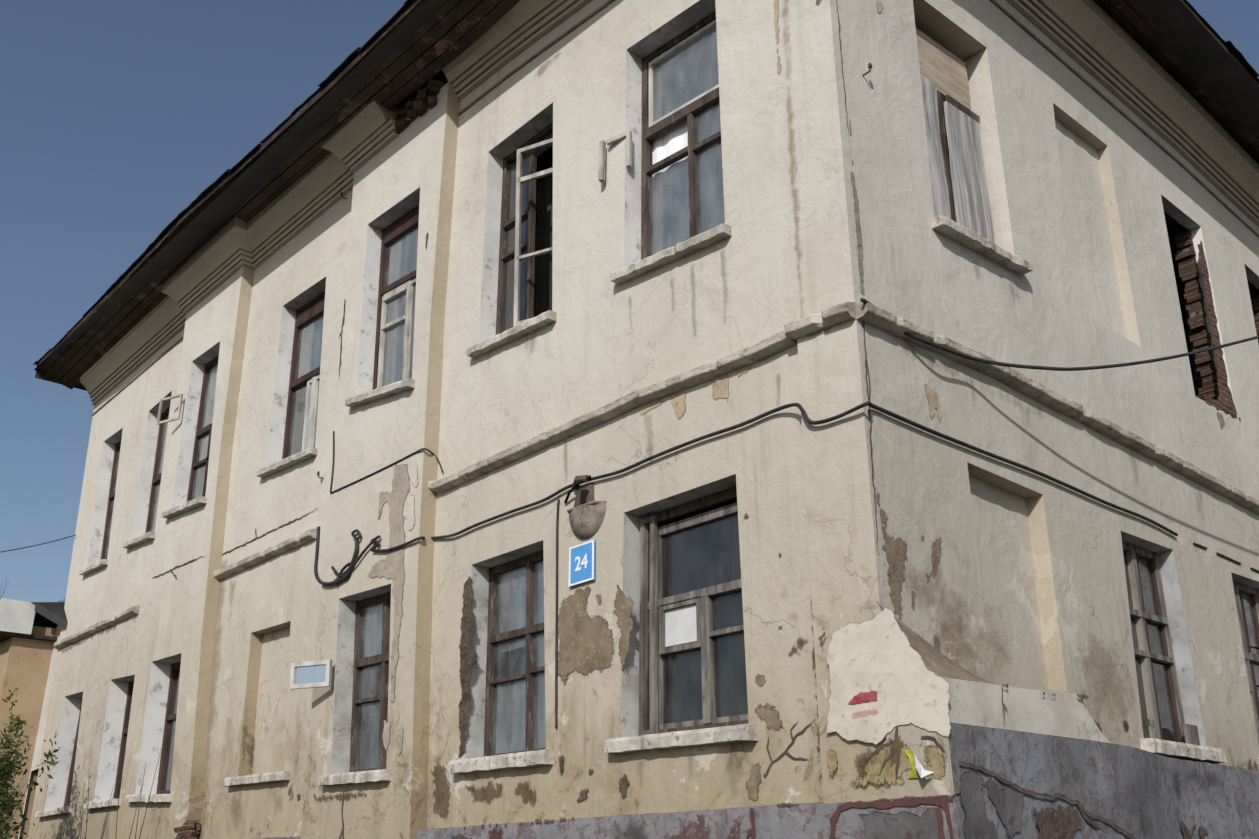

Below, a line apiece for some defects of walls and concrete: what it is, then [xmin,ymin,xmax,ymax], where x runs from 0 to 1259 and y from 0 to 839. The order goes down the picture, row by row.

peeling [924,383,941,420]
peeling [368,464,418,702]
flaking render [458,577,476,758]
flaking render [558,585,634,685]
peeling [826,488,1082,839]
peeling [382,720,404,756]
crack [763,719,815,777]
flaking render [431,765,450,819]
flaking render [465,781,574,839]
crack [746,808,755,839]
flaking render [1178,818,1208,839]